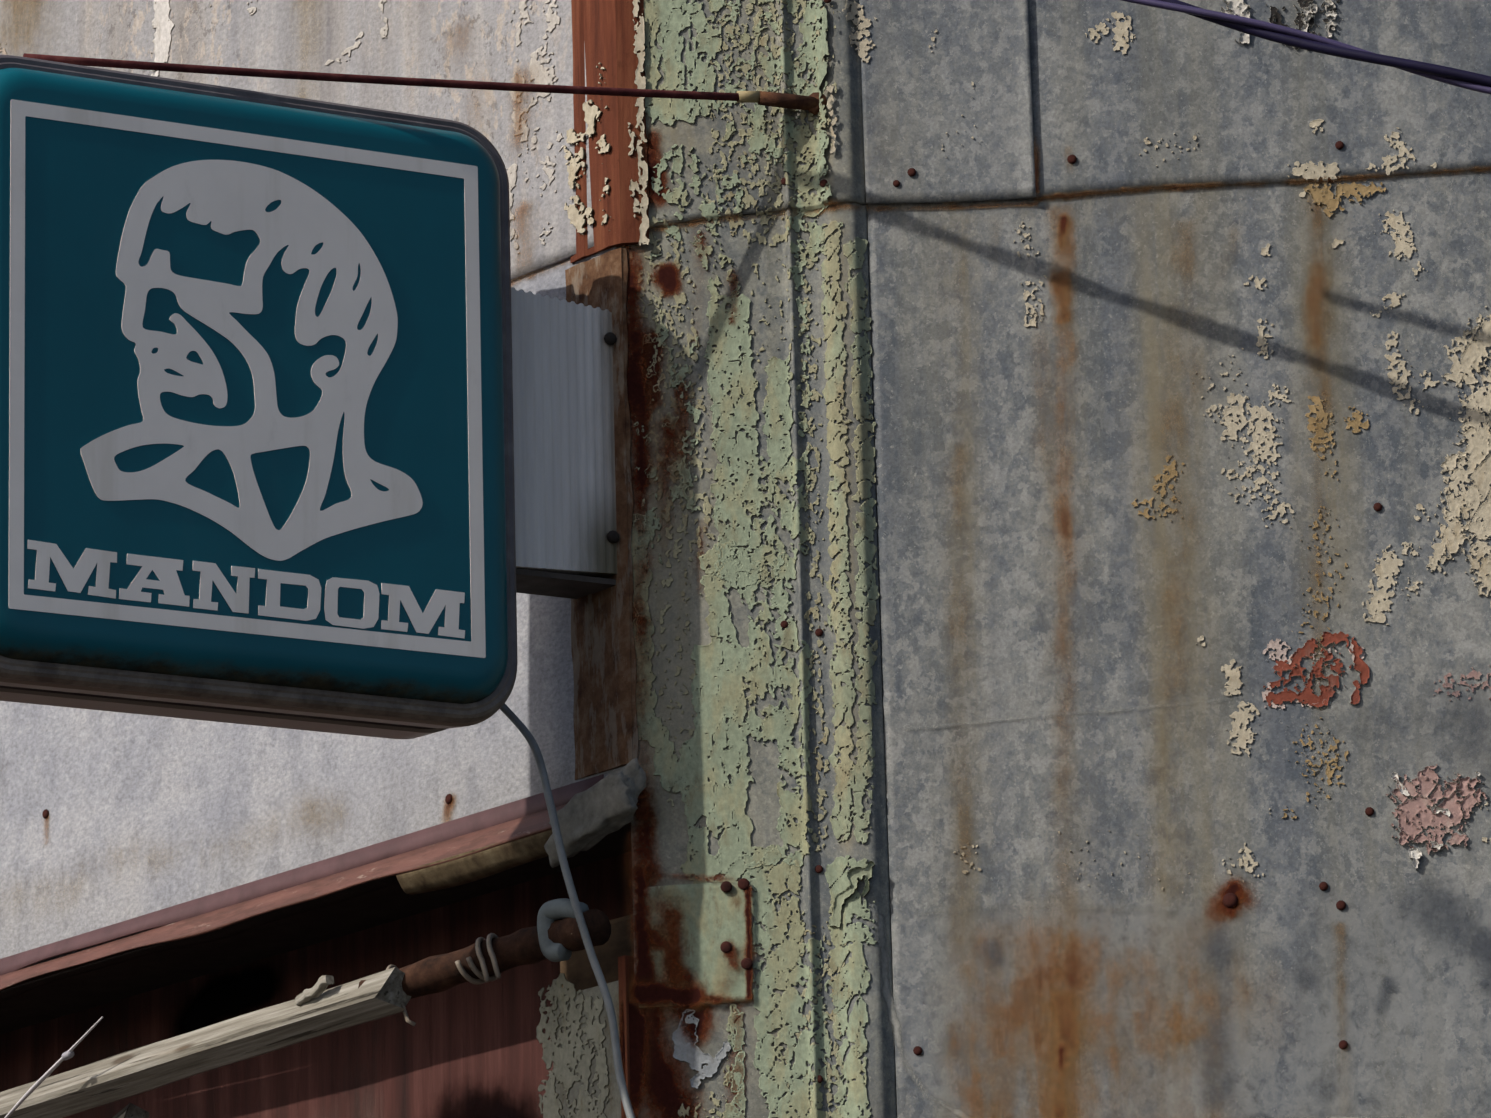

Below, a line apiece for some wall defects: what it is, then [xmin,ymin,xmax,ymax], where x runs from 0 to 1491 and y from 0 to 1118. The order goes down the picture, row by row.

peeling [1221,0,1343,55]
peeling [504,0,611,254]
corrosion [646,131,668,206]
corrosion [1021,148,1102,323]
peeling [1288,127,1437,218]
corrosion [624,244,689,533]
peeling [628,0,880,1118]
peeling [1192,305,1491,819]
corrosion [618,783,752,1118]
corrosion [994,933,1099,1118]
corrosion [1207,881,1251,922]
peeling [1386,764,1491,870]